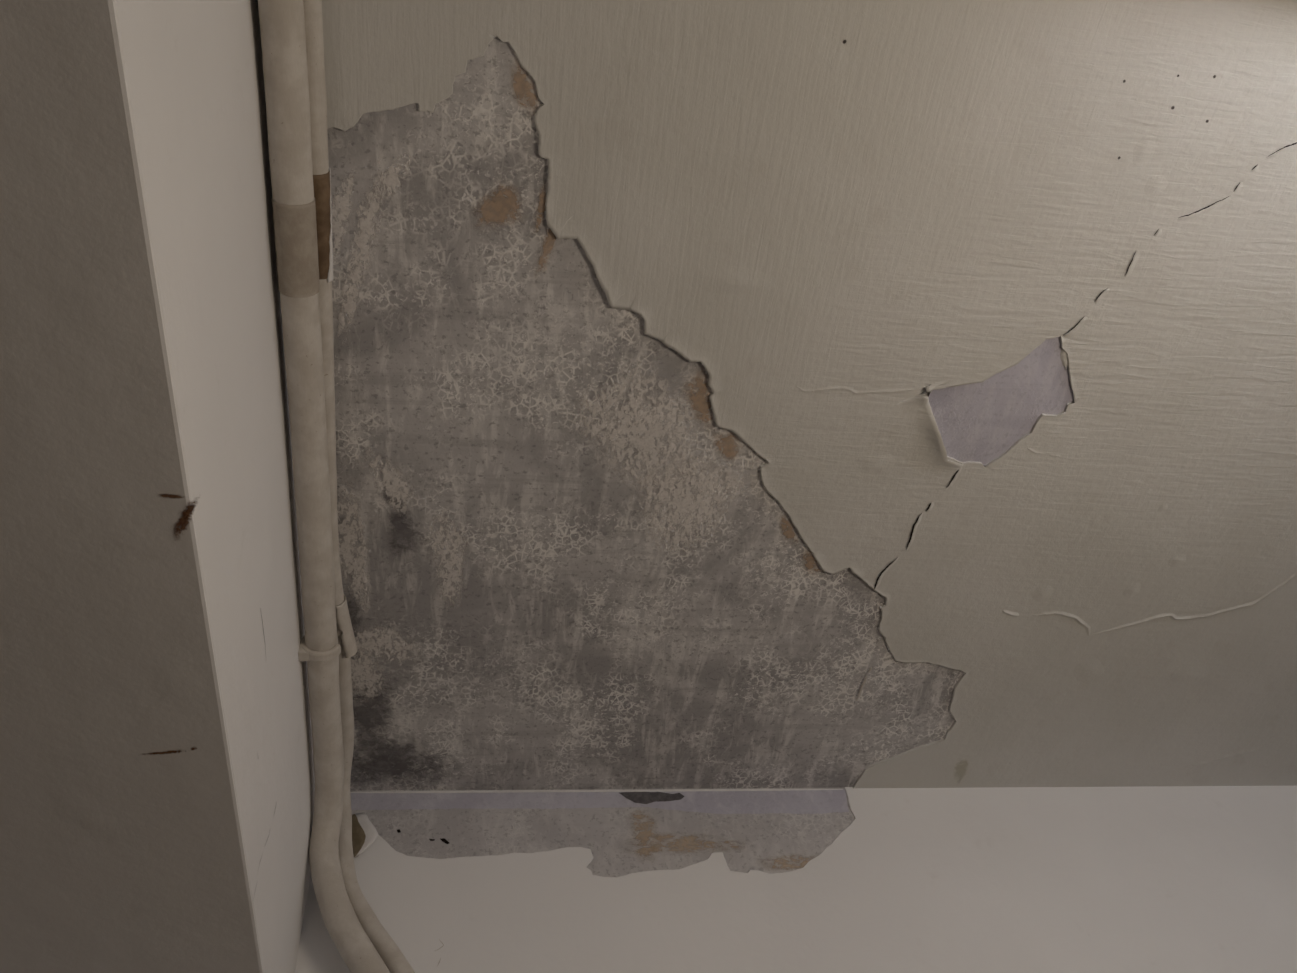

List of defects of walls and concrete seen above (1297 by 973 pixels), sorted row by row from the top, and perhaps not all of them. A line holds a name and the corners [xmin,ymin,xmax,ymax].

crack [1063,141,1297,338]
peeling [327,31,970,883]
crack [874,467,962,589]
peeling [896,333,1082,484]
crack [1002,571,1297,639]